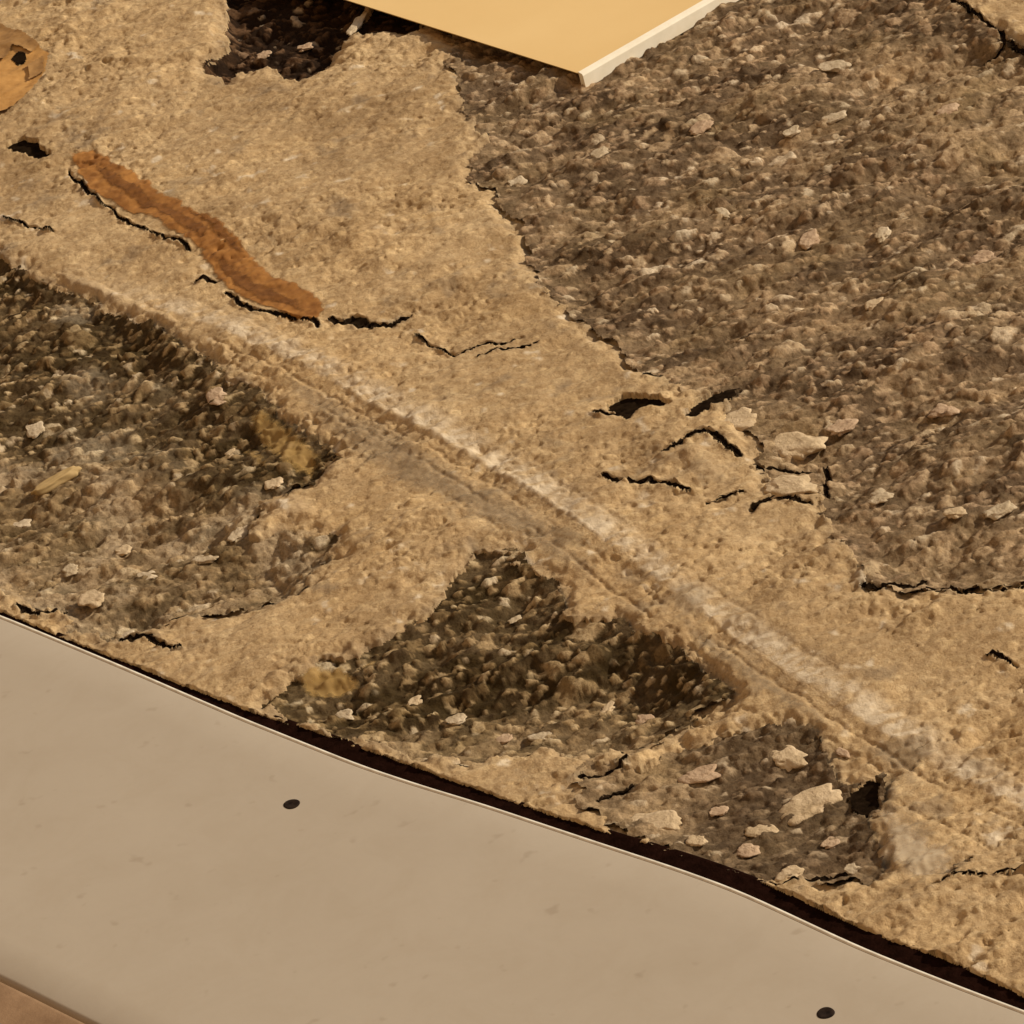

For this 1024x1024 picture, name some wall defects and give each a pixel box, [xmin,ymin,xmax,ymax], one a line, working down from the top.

spalling [204,0,424,86]
crack [952,0,1024,66]
crack [68,170,190,251]
corrosion [72,150,324,327]
crack [195,274,540,358]
spalling [443,0,1024,594]
spalling [0,259,340,643]
crack [602,426,831,510]
crack [859,580,1024,594]
crack [985,649,1014,667]
spalling [261,547,887,885]
crack [941,864,1022,881]